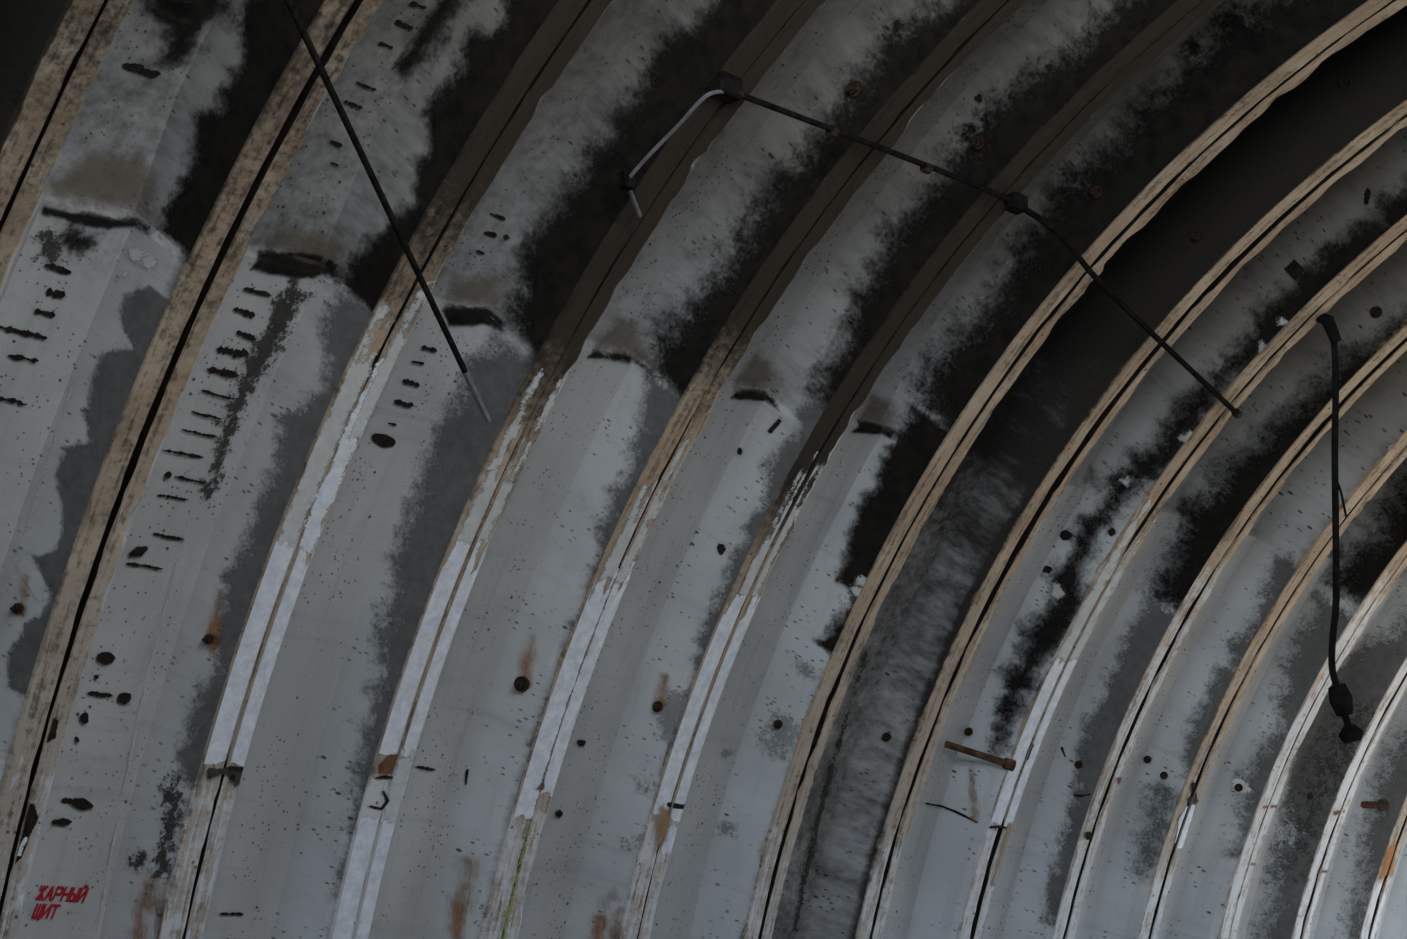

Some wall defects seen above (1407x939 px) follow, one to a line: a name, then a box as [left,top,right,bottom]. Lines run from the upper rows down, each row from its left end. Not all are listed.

leakage [816,399,948,653]
spalling [129,546,148,557]
spalling [94,652,115,679]
spalling [118,692,131,705]
spalling [47,718,59,743]
spalling [74,712,89,743]
leakage [759,711,802,760]
spalling [15,798,93,864]
rust [127,773,190,939]